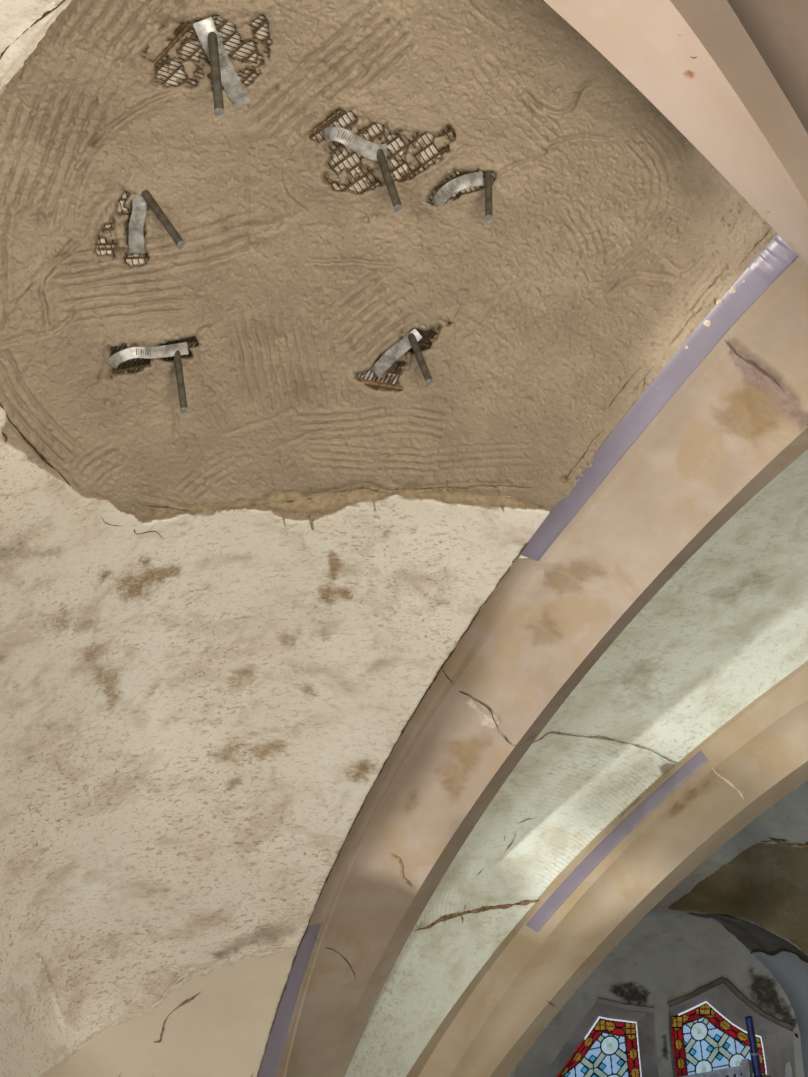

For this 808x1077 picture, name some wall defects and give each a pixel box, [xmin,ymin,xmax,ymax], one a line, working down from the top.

flaking render [0,0,778,523]
crack [670,226,771,344]
crack [725,340,784,392]
crack [564,368,652,481]
damp [123,560,179,599]
damp [321,554,350,603]
damp [88,647,118,705]
damp [257,741,284,758]
crack [251,543,678,1077]
crack [712,768,753,812]
flaking render [668,840,808,963]
crack [154,993,199,1043]